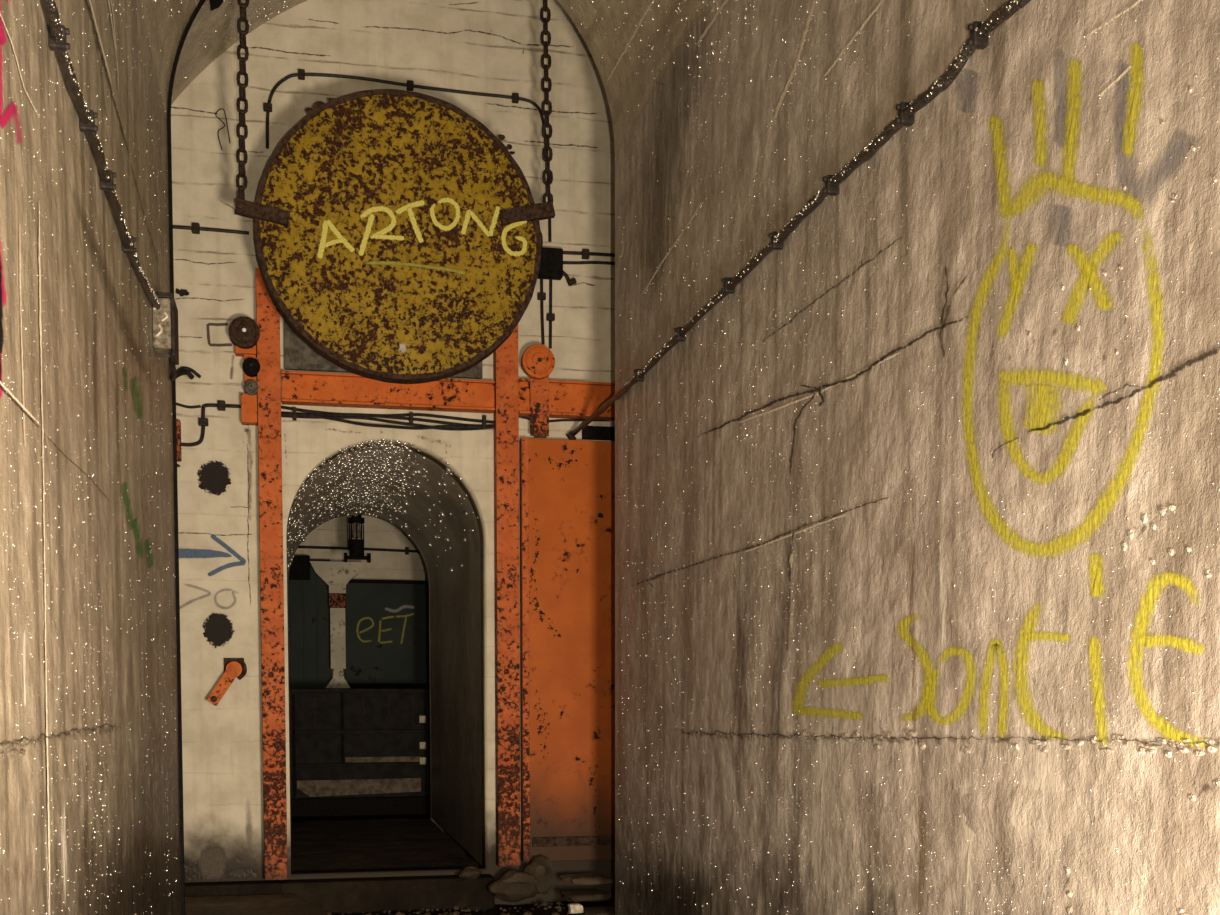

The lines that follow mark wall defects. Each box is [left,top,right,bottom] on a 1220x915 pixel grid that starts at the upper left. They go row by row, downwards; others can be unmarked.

crack [763,238,900,341]
crack [697,267,967,473]
crack [991,347,1219,458]
rust [529,517,563,638]
rust [534,690,567,770]